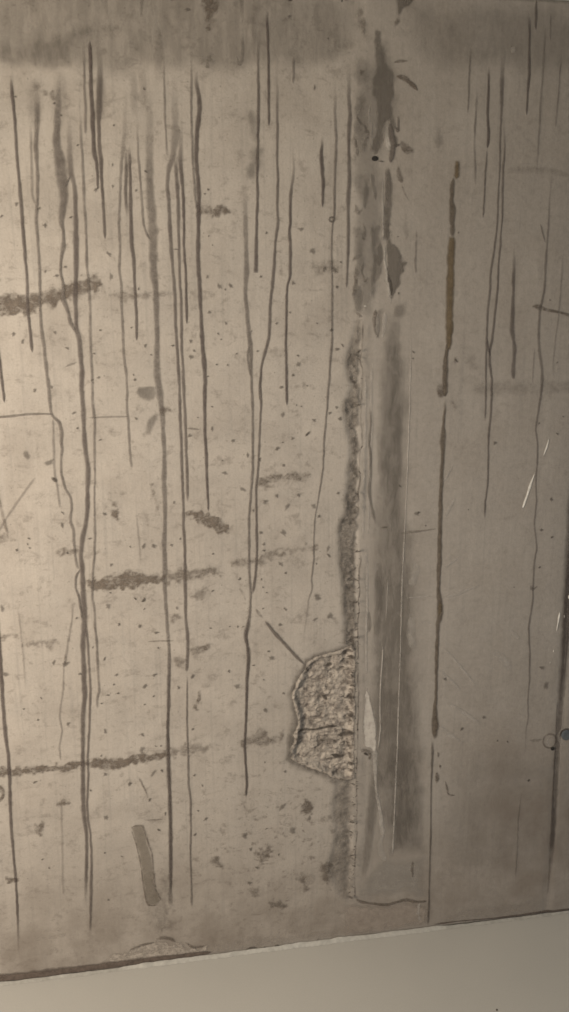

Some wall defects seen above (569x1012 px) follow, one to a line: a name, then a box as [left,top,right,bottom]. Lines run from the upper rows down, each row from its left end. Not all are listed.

water stain [0,643,18,925]
water stain [10,44,106,924]
water stain [118,158,172,895]
water stain [166,85,209,669]
water stain [244,21,292,793]
spalling [287,646,356,780]
water stain [312,108,351,575]
water stain [363,651,396,850]
water stain [387,237,406,298]
rust [432,408,446,737]
rust [442,162,459,396]
water stain [545,526,569,848]